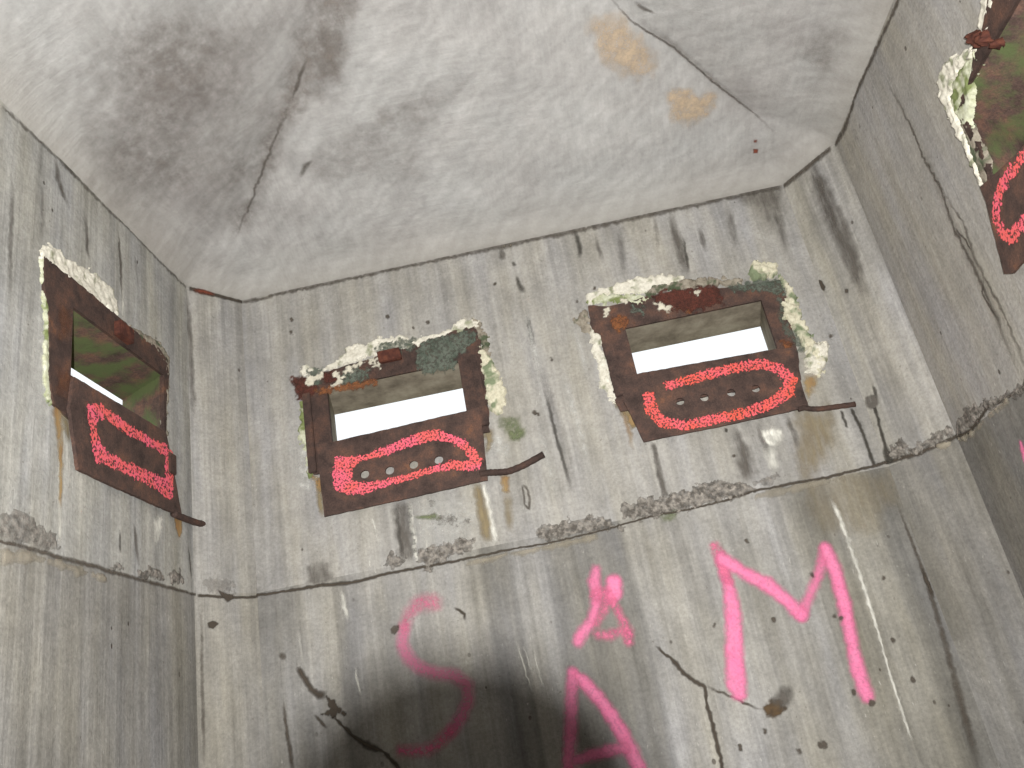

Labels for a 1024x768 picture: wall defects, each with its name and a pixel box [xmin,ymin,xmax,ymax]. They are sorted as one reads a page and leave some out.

crack [8,0,898,303]
crack [909,122,1011,329]
spalling [0,510,57,549]
rust [54,407,69,500]
spalling [386,537,476,573]
rust [475,487,490,538]
crack [0,390,1023,599]
spalling [536,478,771,542]
spalling [887,383,1024,459]
crack [280,654,400,768]
crack [659,648,753,768]